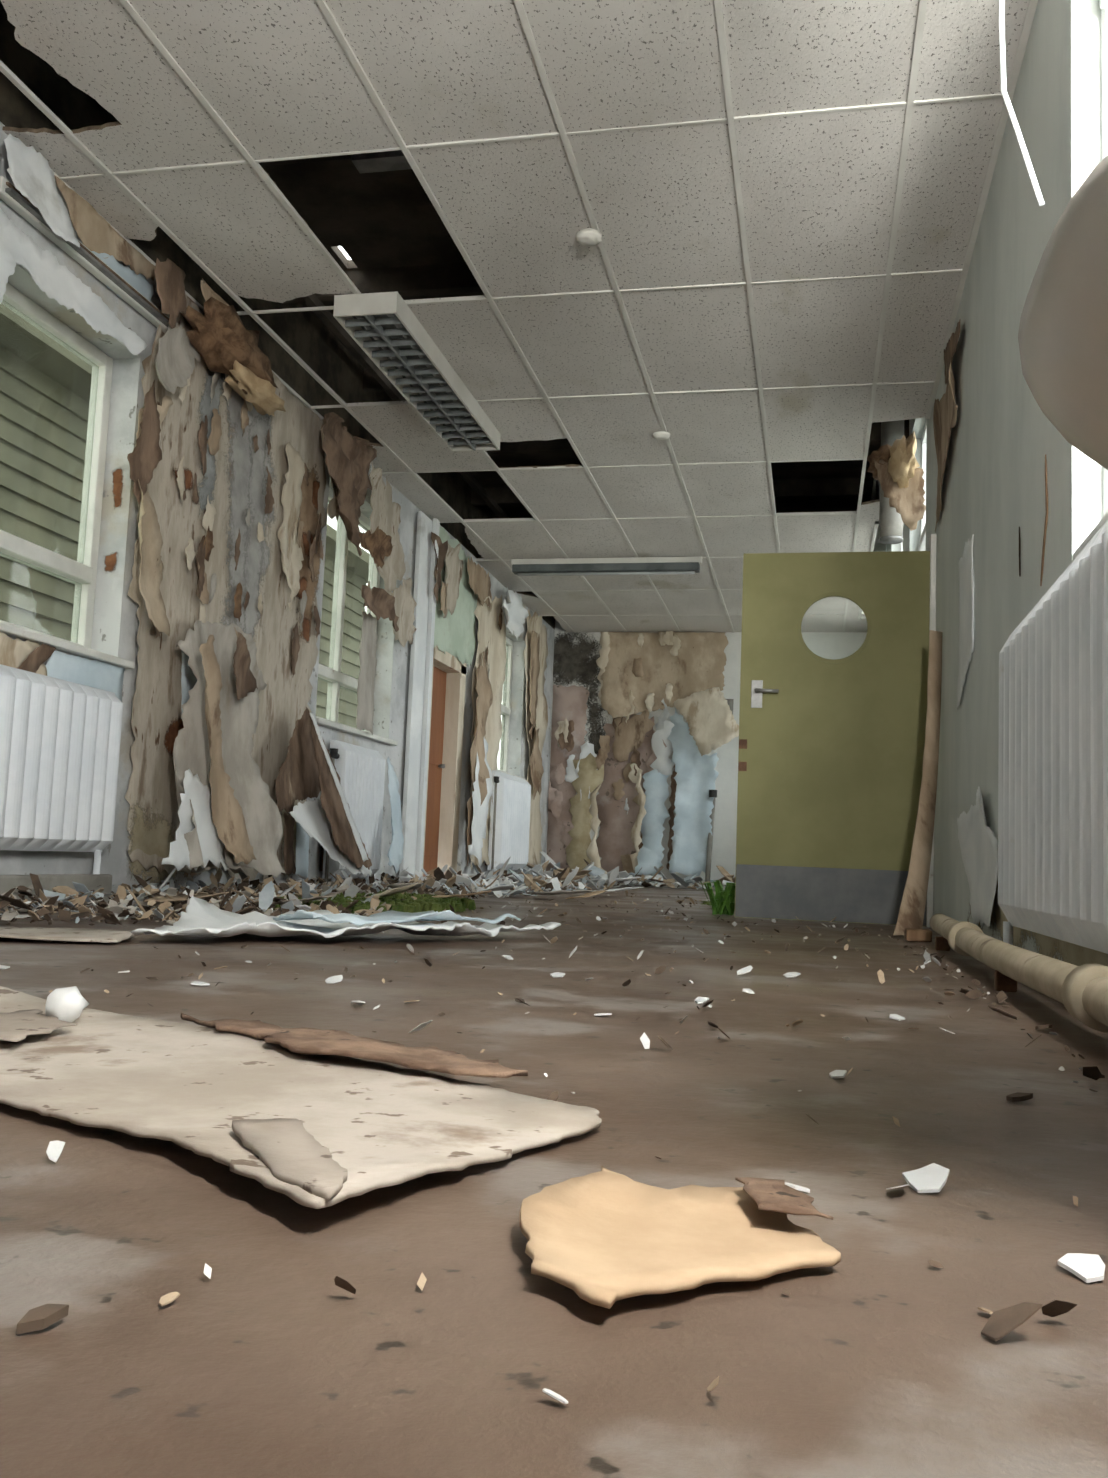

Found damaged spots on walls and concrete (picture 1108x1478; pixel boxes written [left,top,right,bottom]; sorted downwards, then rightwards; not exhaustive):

peeling [177,372,324,676]
peeling [431,527,502,678]
peeling [545,631,719,877]